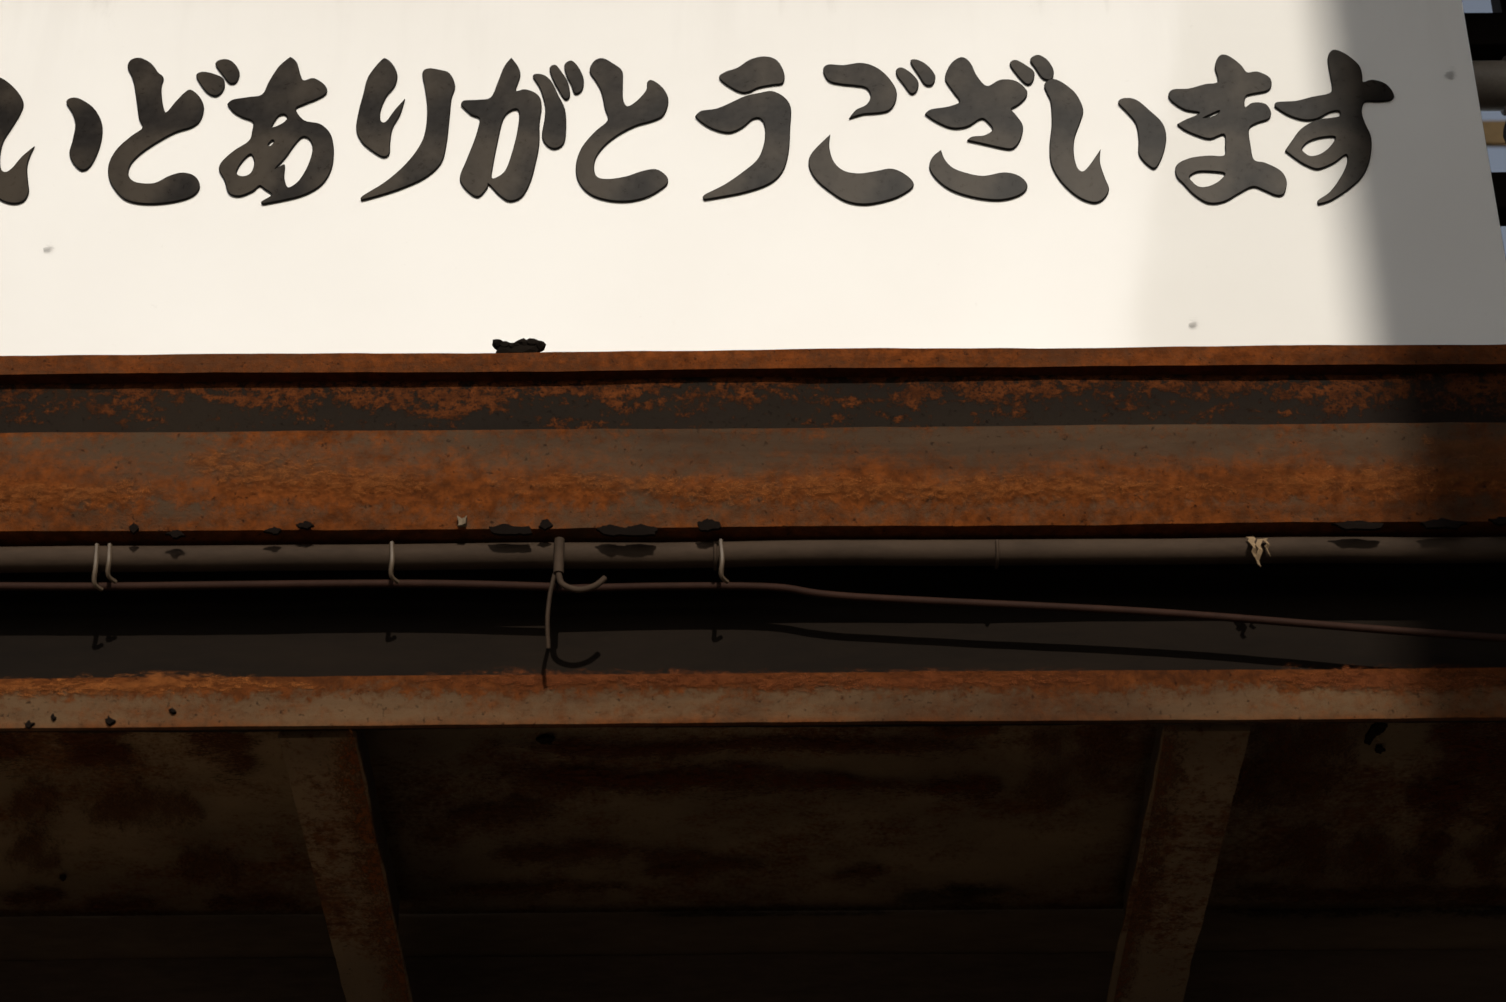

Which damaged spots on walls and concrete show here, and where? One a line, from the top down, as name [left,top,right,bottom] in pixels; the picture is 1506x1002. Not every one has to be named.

corrosion [0,673,323,697]
corrosion [471,670,1089,691]